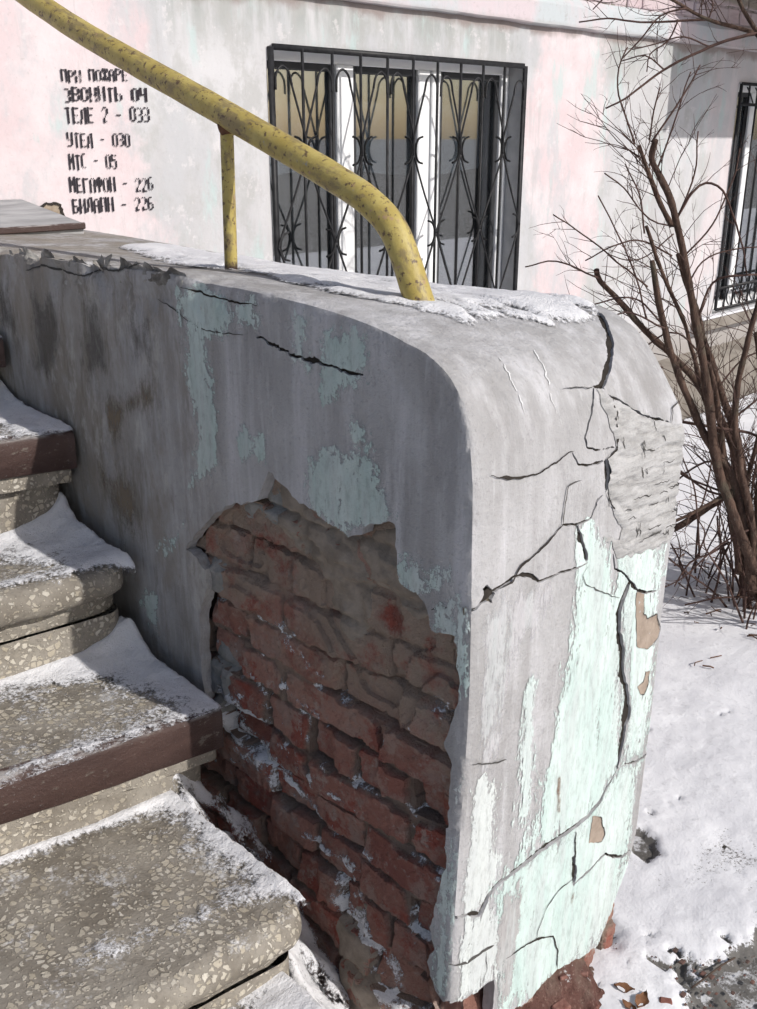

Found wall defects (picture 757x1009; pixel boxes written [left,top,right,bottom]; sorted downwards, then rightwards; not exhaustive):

crack [158,287,363,375]
peeling [285,307,372,408]
crack [432,314,653,764]
spalling [195,416,670,1009]
crack [450,805,595,985]